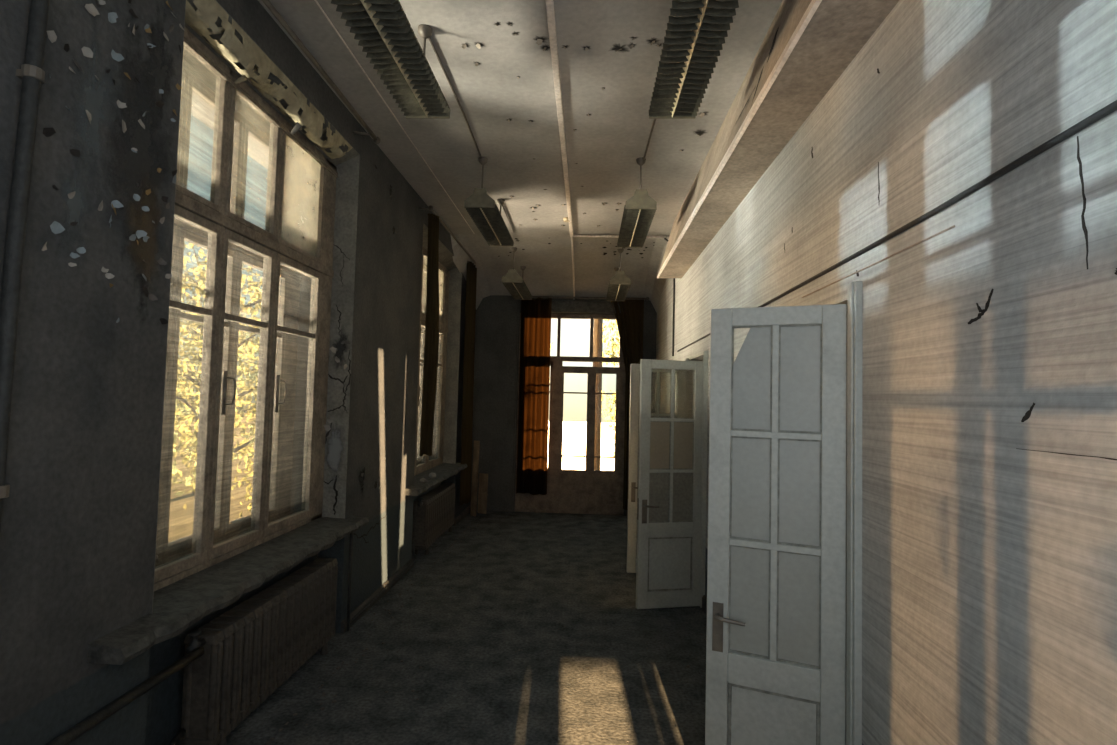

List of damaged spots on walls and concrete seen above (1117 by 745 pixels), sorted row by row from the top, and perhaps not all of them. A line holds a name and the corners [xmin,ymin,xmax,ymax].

peeling [535,36,568,51]
peeling [612,37,662,52]
crack [1077,136,1088,269]